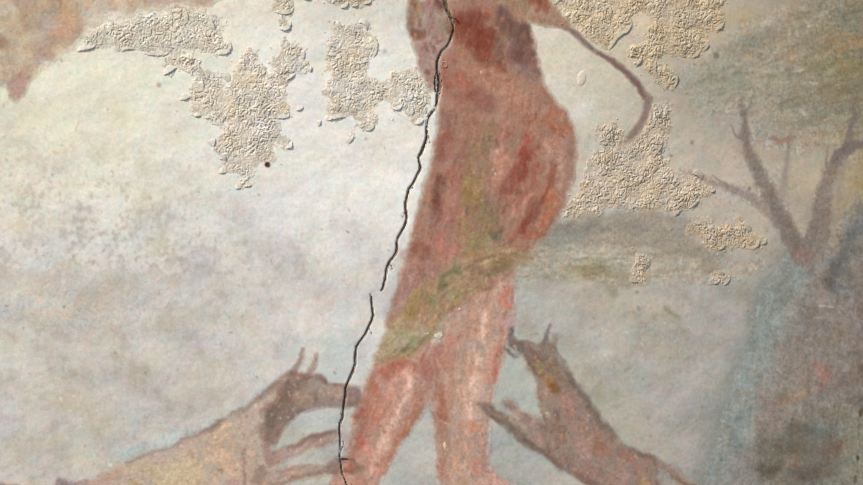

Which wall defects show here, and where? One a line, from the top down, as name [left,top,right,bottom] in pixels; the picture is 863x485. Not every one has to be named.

flaking render [77,0,438,190]
crack [339,0,459,485]
flaking render [552,0,767,292]